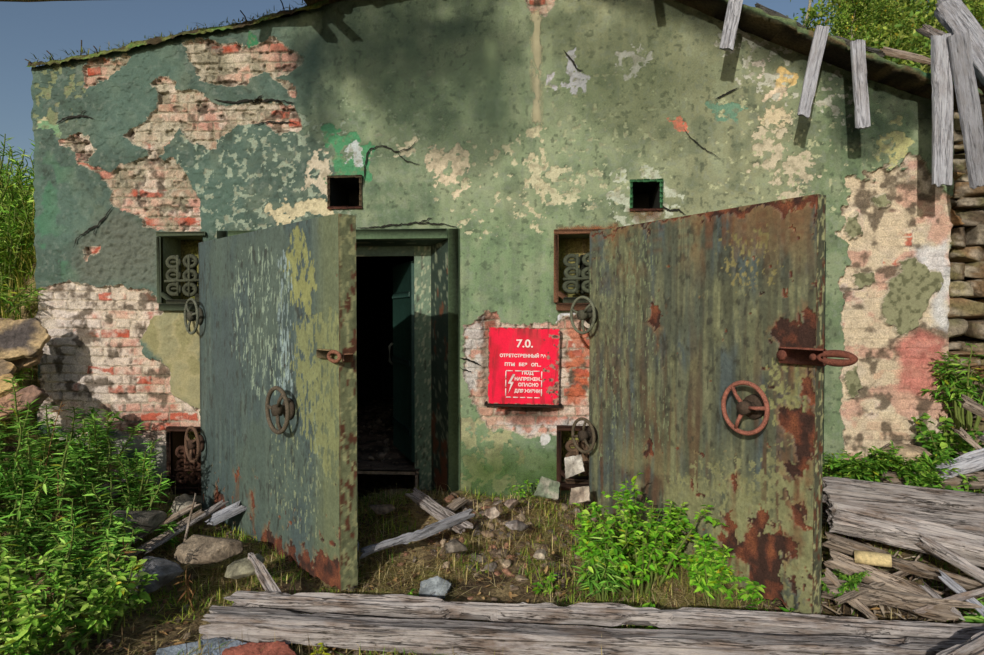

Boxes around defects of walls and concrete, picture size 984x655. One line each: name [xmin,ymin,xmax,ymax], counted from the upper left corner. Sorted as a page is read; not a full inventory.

damp [532,11,542,123]
crack [363,141,416,184]
peeling [394,135,471,197]
rust [564,194,818,242]
flaking render [34,31,376,544]
flaking render [460,125,671,495]
rust [769,306,817,348]
flaking render [835,115,953,460]
rust [779,365,815,480]
peeling [662,357,815,614]
rust [255,515,341,591]
rust [718,503,813,612]